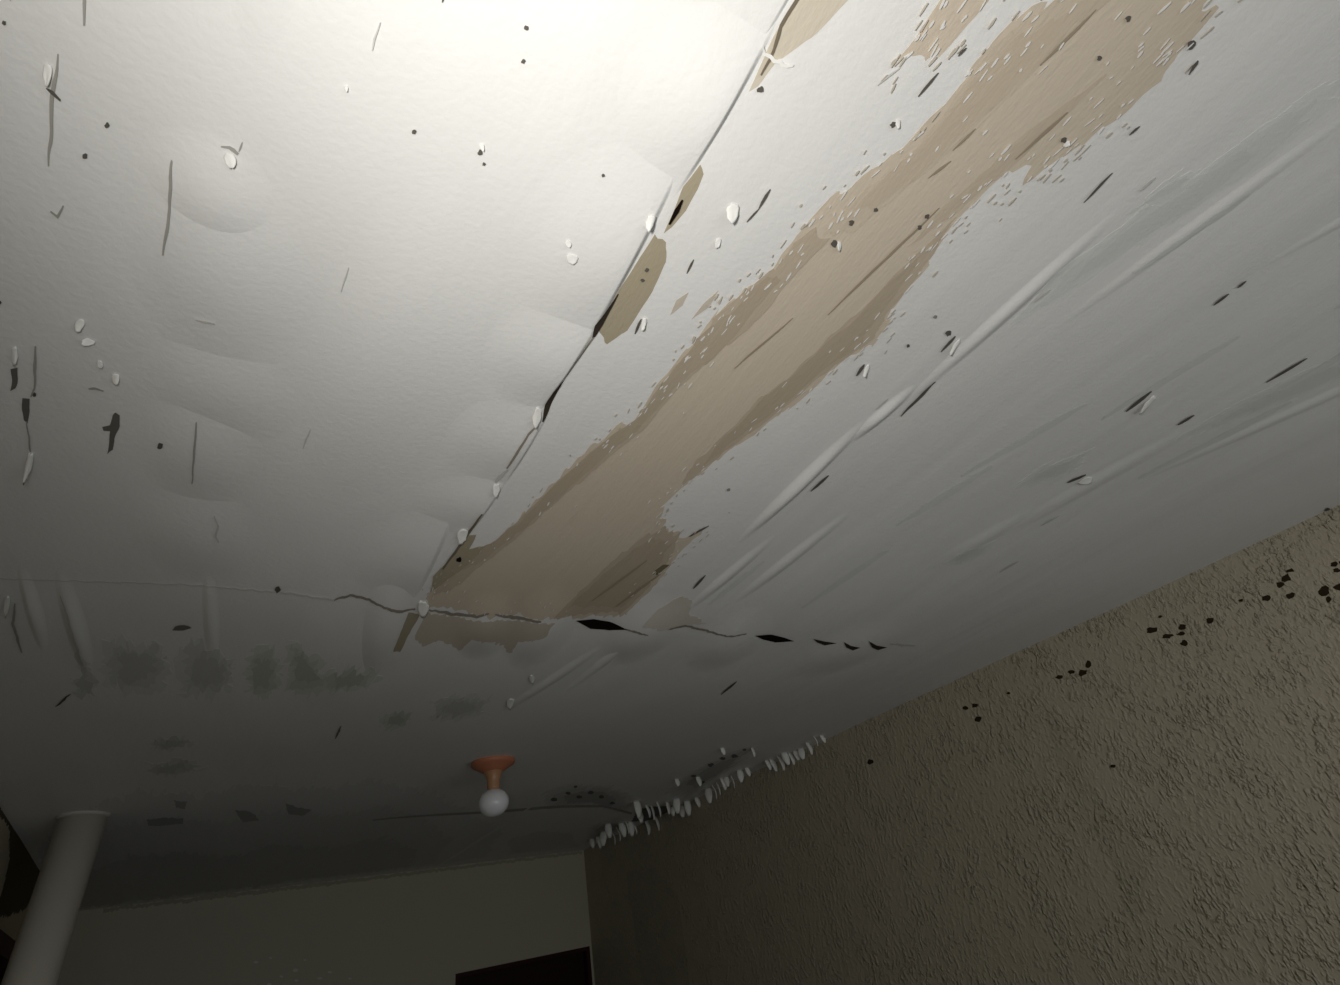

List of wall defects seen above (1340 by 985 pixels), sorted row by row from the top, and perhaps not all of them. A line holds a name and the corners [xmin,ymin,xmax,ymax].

crack [760,0,799,76]
crack [877,48,967,97]
crack [669,200,683,225]
crack [747,189,771,222]
crack [564,294,642,380]
peeling [418,0,1219,621]
crack [876,336,956,416]
leakage [1262,568,1295,601]
leakage [1318,561,1340,603]
mould [68,625,383,703]
leakage [1147,615,1188,646]
leakage [80,735,768,913]